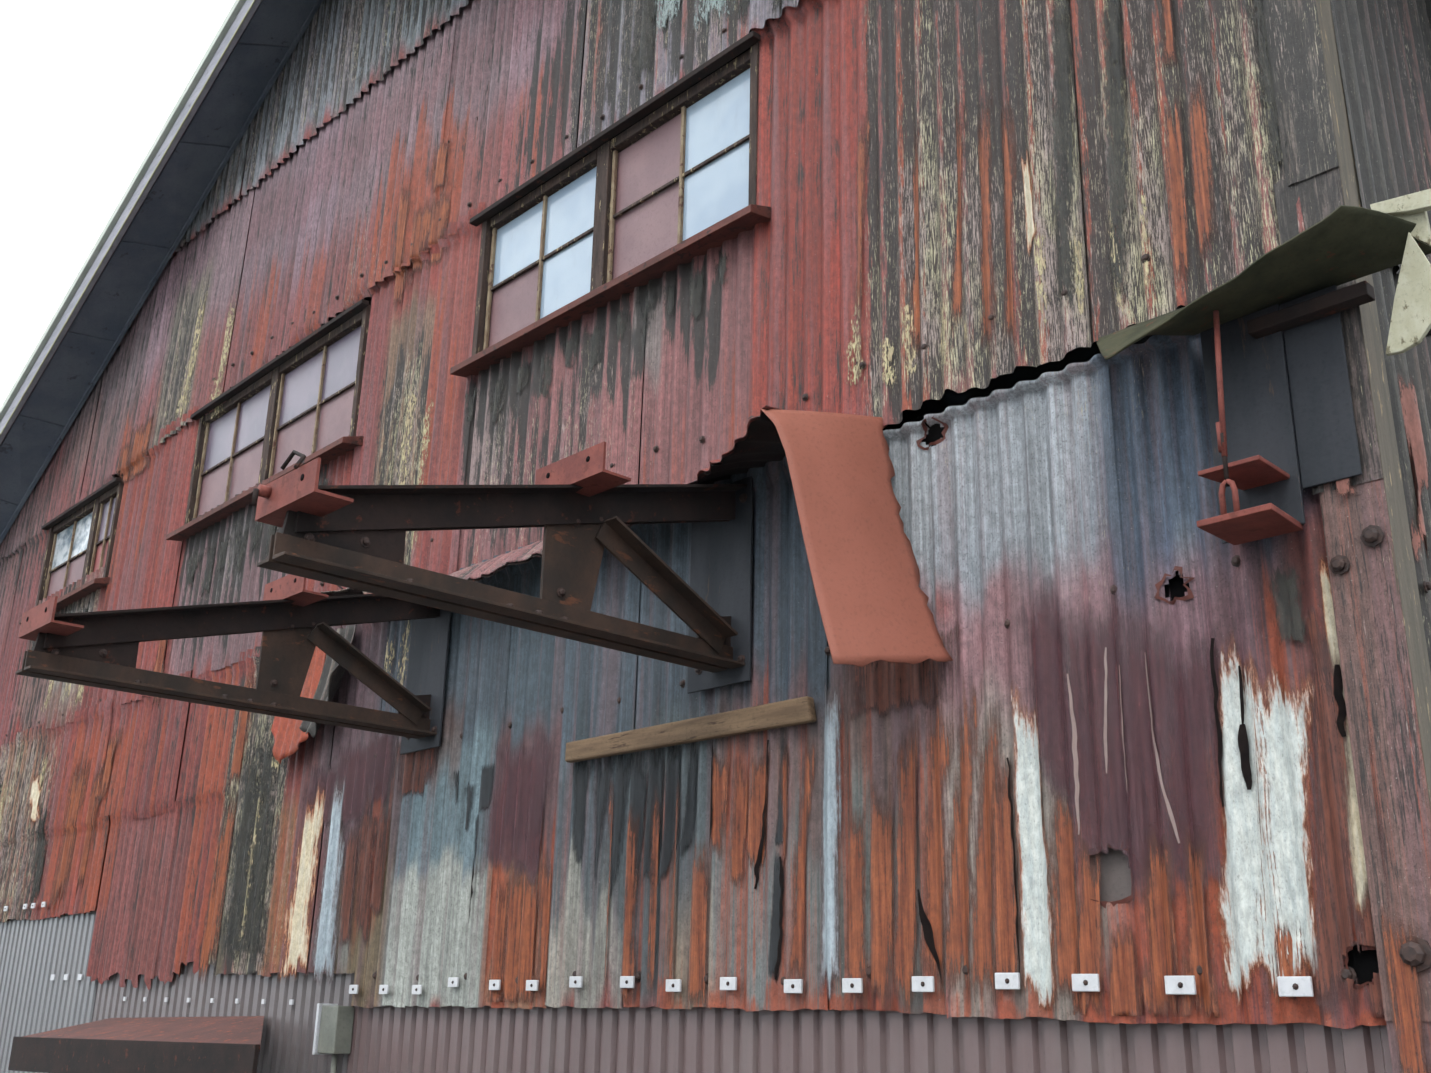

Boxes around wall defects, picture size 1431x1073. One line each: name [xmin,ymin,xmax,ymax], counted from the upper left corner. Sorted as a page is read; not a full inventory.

damp [629,0,656,79]
damp [738,0,750,24]
rust [951,97,1017,353]
damp [28,805,52,907]
damp [222,717,279,968]
rust [303,733,438,951]
rust [486,850,552,1003]
rust [604,742,815,1007]
rust [843,623,1019,1010]
peeling [1011,688,1055,1011]
rust [1023,581,1221,1018]
peeling [1217,637,1319,1003]